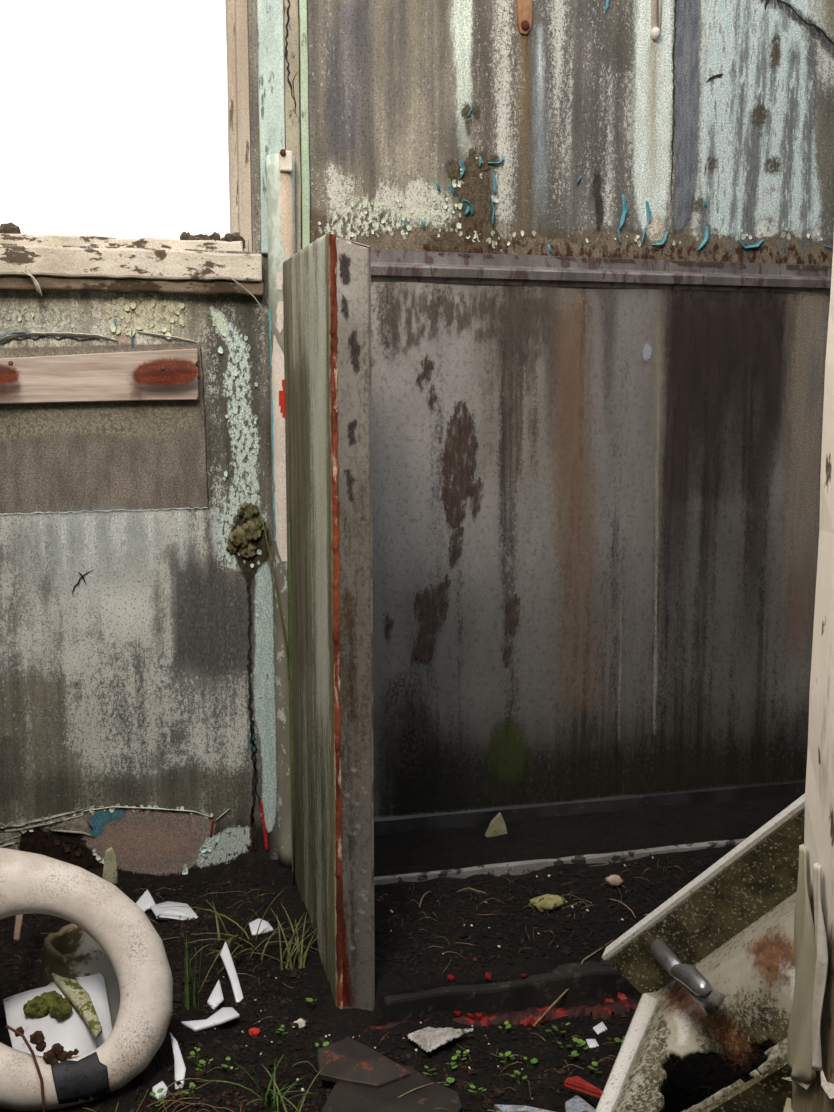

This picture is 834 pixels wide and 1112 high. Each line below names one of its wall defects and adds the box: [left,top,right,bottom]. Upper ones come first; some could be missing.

crack [761,0,834,57]
peeling [316,0,833,266]
peeling [280,172,293,259]
corrosion [384,287,551,373]
corrosion [416,353,439,413]
water stain [643,290,826,569]
water stain [25,513,157,598]
spalling [0,272,287,833]
corrosion [412,400,483,664]
corrosion [501,593,520,666]
spalling [0,802,251,876]